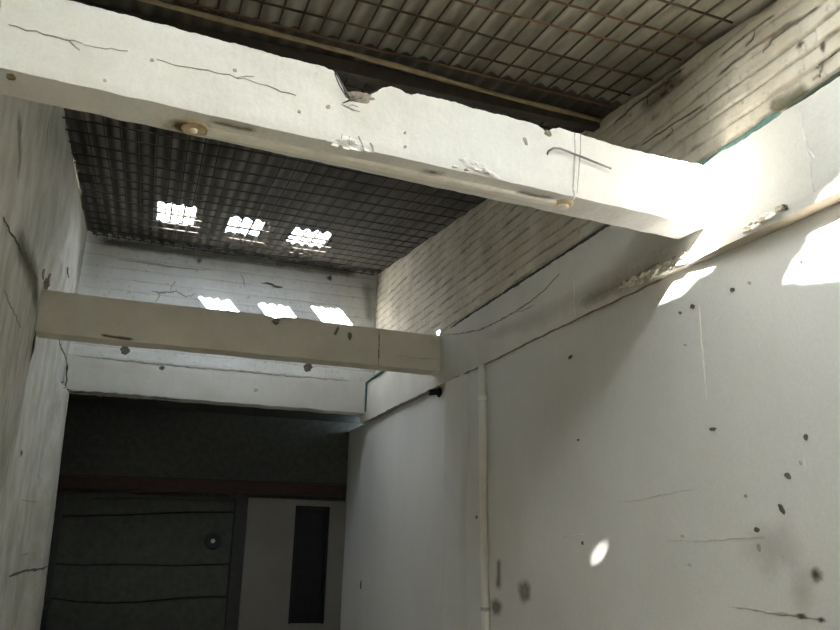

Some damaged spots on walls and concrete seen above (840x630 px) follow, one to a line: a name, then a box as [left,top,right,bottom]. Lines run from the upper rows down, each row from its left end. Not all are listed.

crack [9,24,128,51]
crack [157,59,296,96]
spalling [334,72,378,112]
peeling [328,135,374,153]
crack [3,217,19,248]
spalling [742,204,788,233]
crack [118,259,210,303]
peeling [618,250,698,293]
crack [59,340,347,390]